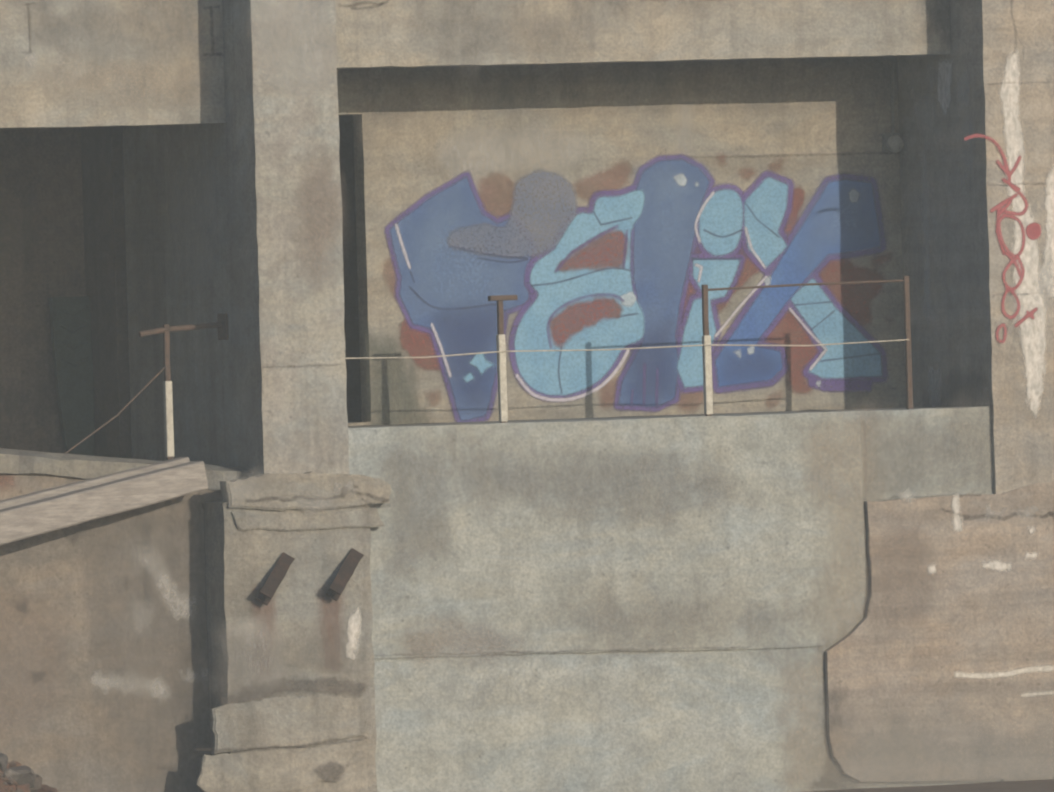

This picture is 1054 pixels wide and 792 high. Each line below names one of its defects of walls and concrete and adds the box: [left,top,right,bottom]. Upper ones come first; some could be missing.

spalling [196,695,366,792]